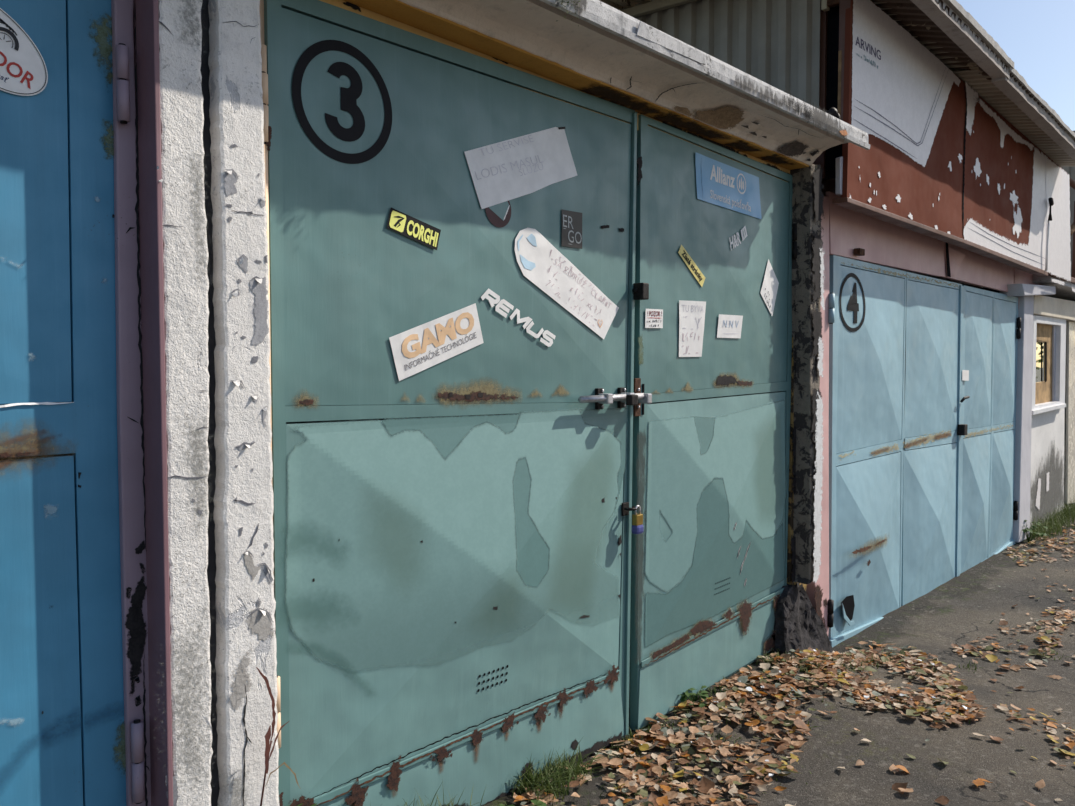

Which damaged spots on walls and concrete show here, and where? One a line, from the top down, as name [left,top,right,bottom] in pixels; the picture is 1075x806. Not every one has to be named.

peeling [223,169,238,223]
peeling [974,158,1023,238]
peeling [231,254,269,363]
rust [438,382,518,404]
rust [714,374,752,387]
rust [0,429,55,468]
water stain [1030,445,1065,526]
peeling [244,543,274,583]
peeling [125,541,147,706]
peeling [246,598,274,641]
rust [642,595,779,668]
rust [279,665,622,806]